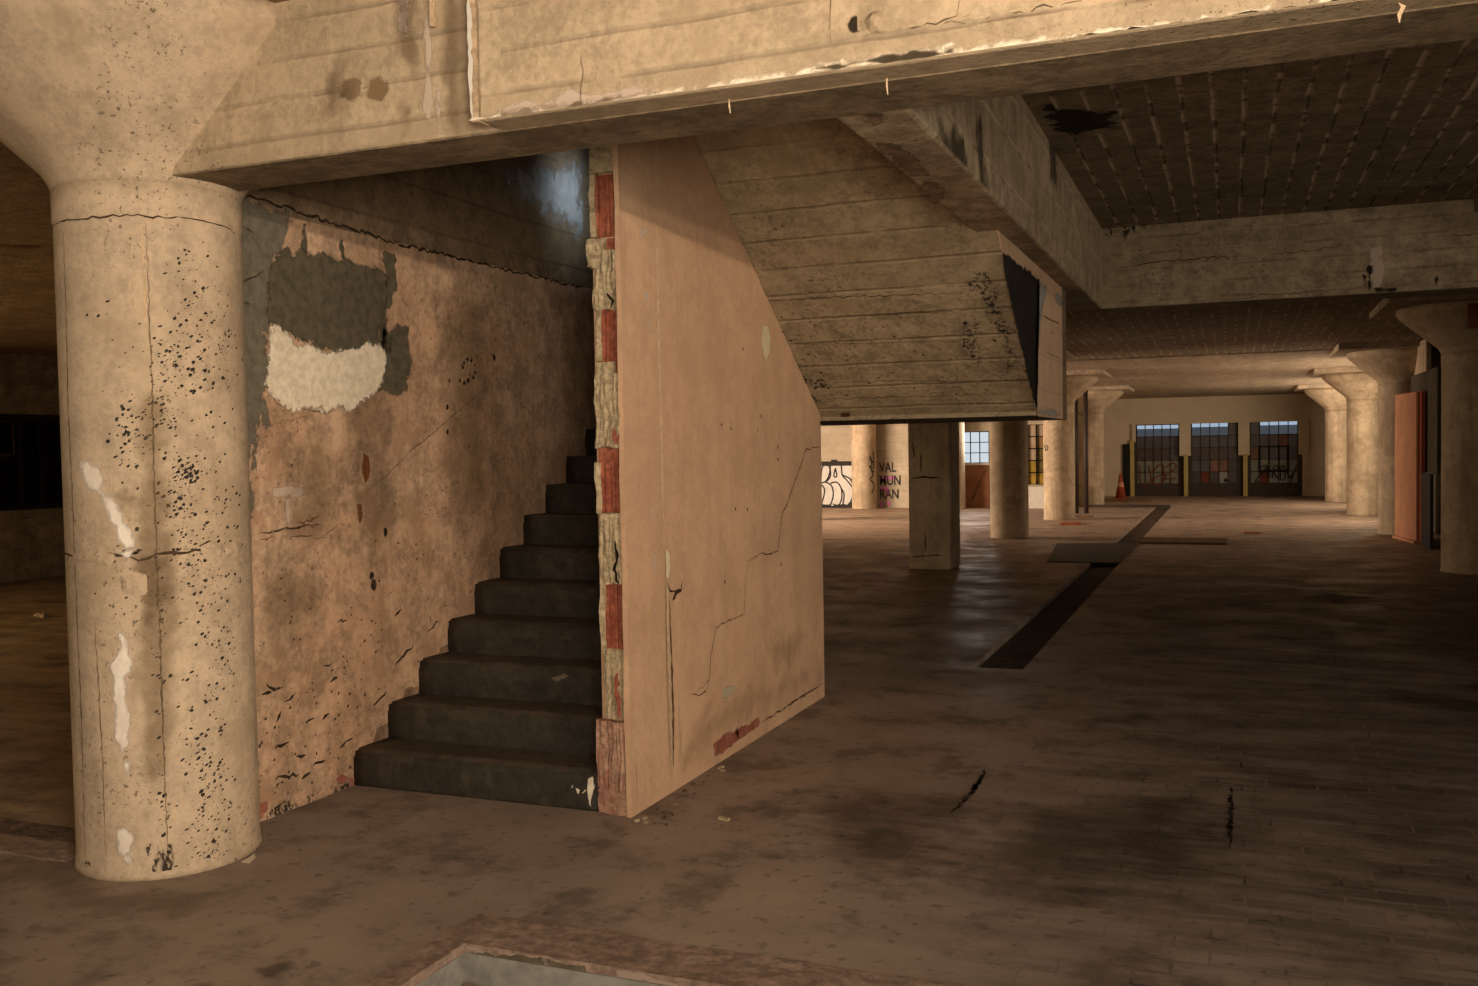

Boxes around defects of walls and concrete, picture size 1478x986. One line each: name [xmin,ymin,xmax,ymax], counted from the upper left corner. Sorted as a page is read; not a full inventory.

spalling [84,224,448,867]
spalling [571,145,627,816]
crack [693,446,819,696]